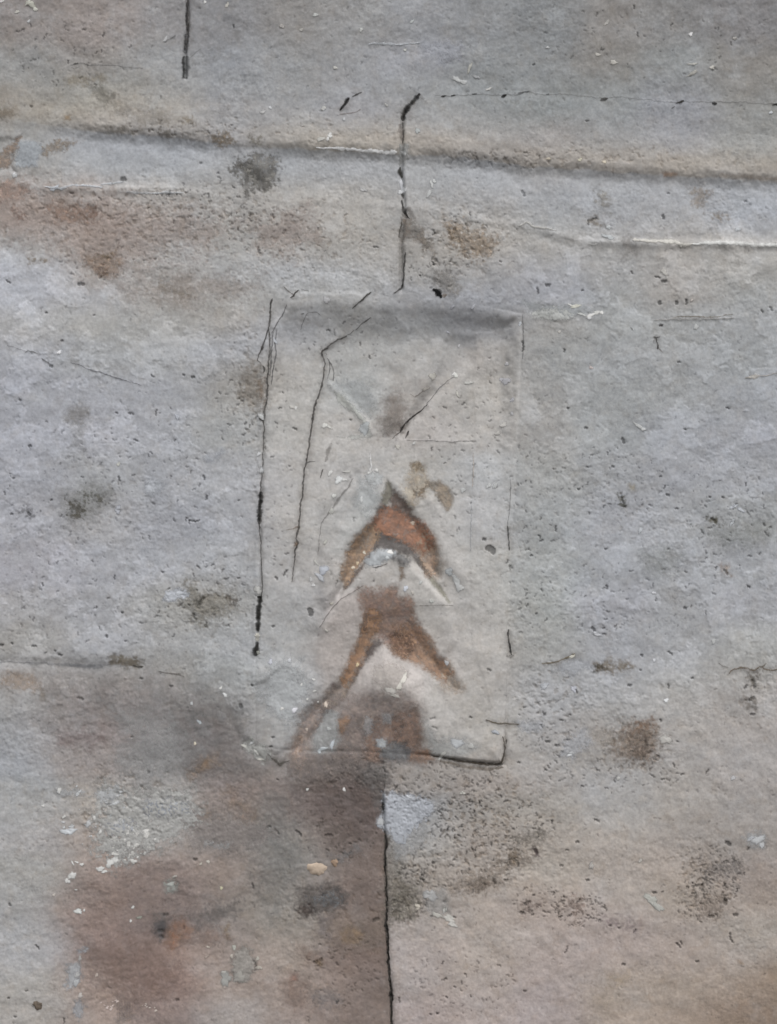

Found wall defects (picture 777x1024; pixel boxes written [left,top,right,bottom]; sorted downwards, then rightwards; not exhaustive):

crack [172,0,190,78]
crack [292,93,476,580]
crack [253,287,320,656]
corrosion [341,462,453,586]
water stain [255,633,407,754]
corrosion [323,587,460,762]
crack [381,802,393,1023]